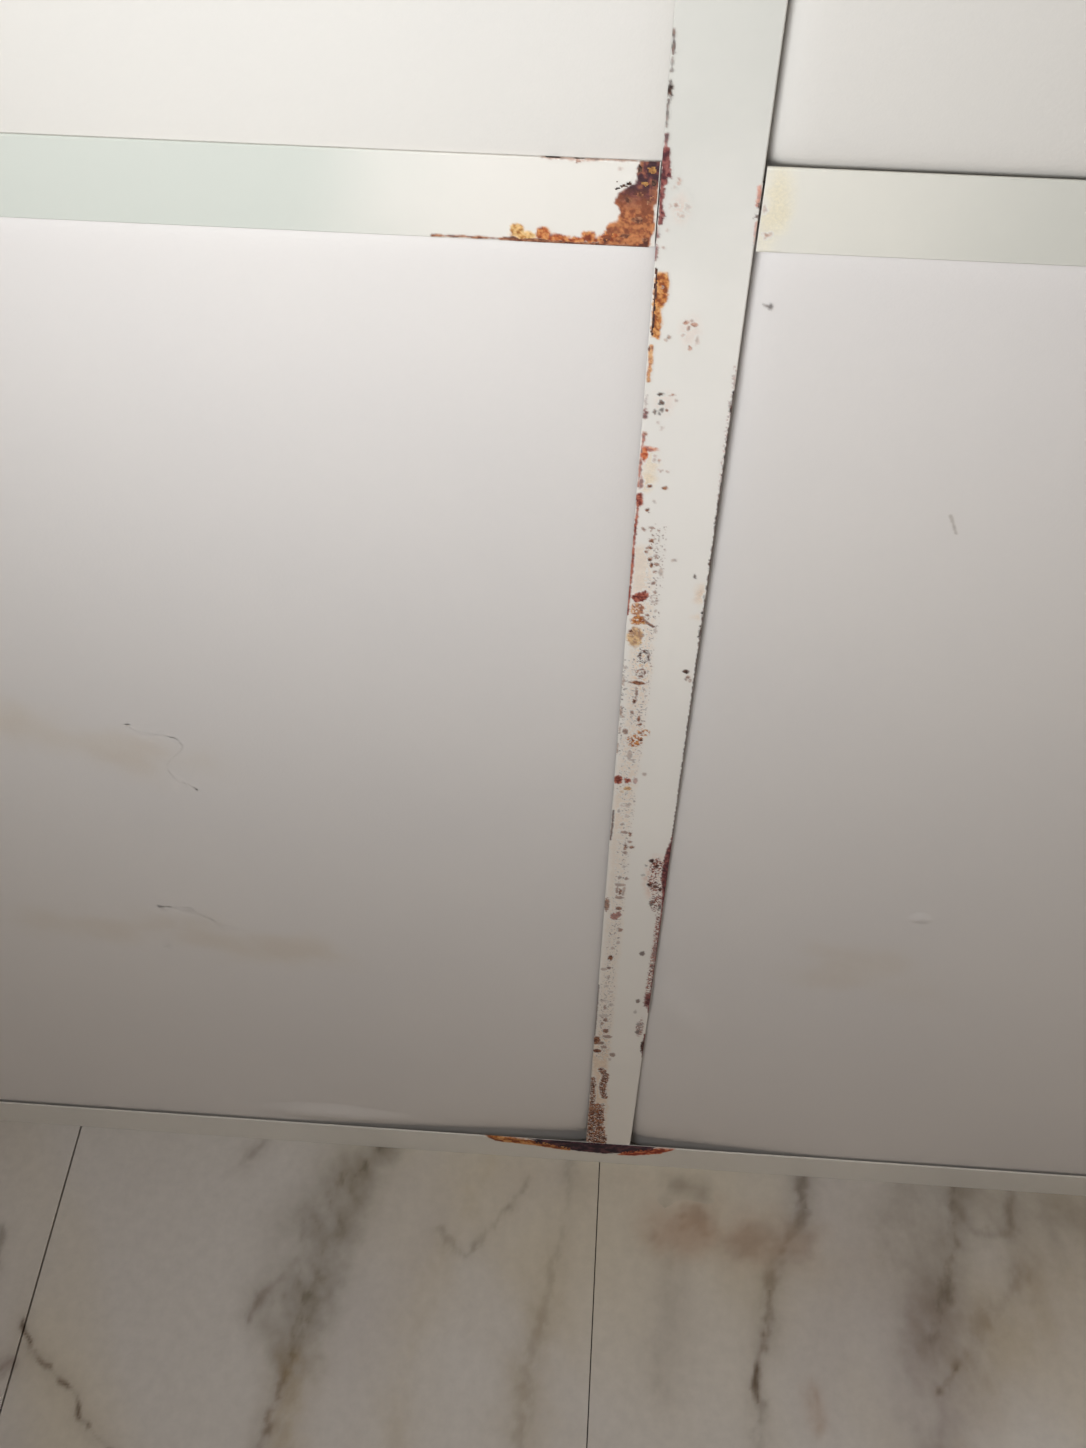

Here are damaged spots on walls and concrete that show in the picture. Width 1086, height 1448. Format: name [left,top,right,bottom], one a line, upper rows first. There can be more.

corrosion [429,26,738,1157]
corrosion [750,166,804,253]